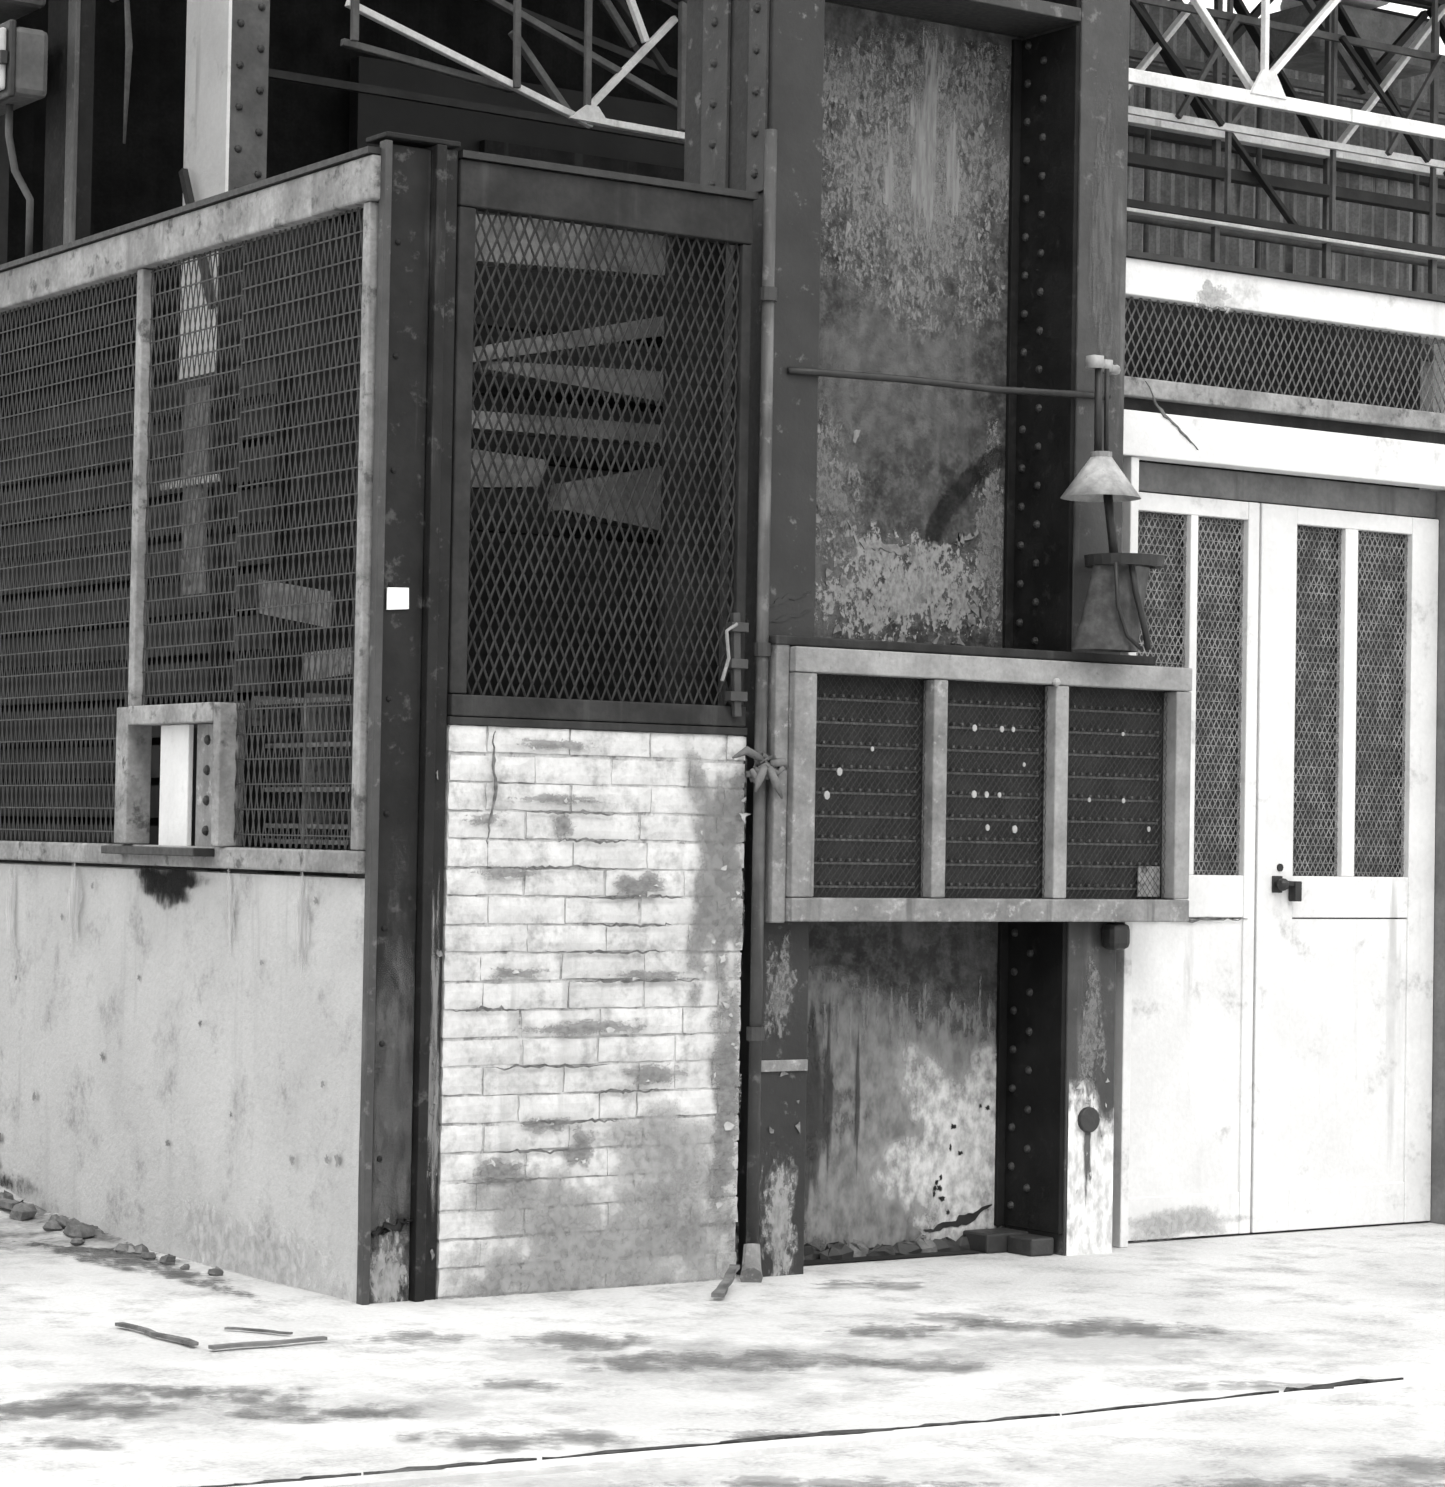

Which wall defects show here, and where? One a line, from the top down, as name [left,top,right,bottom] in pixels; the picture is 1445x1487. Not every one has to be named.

leakage [139,866,197,905]
leakage [449,1102,728,1299]
corrosion [804,1204,992,1260]